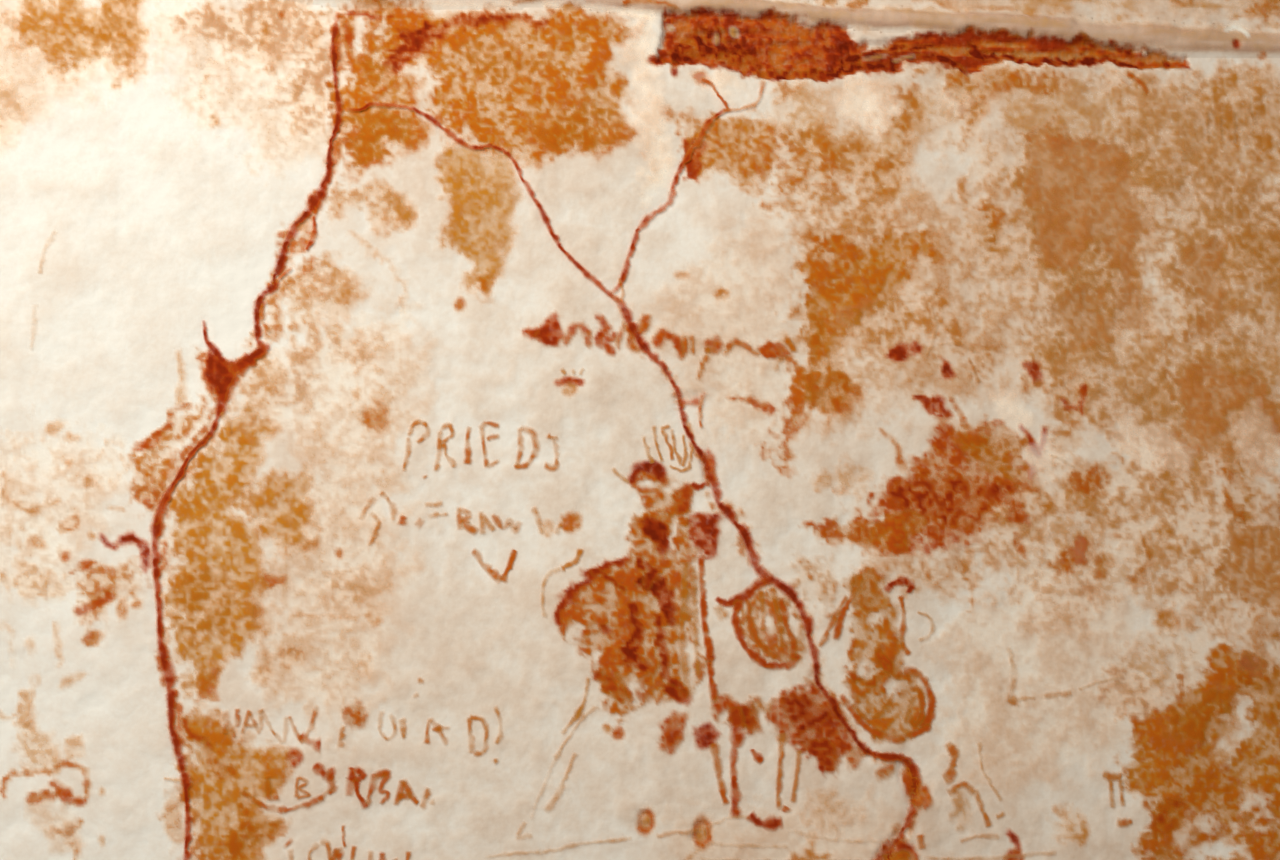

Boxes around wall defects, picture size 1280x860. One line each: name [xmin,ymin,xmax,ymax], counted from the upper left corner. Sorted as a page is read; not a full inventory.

corrosion [330,0,637,174]
crack [151,16,932,860]
flaking render [606,0,1190,94]
water stain [665,68,1280,860]